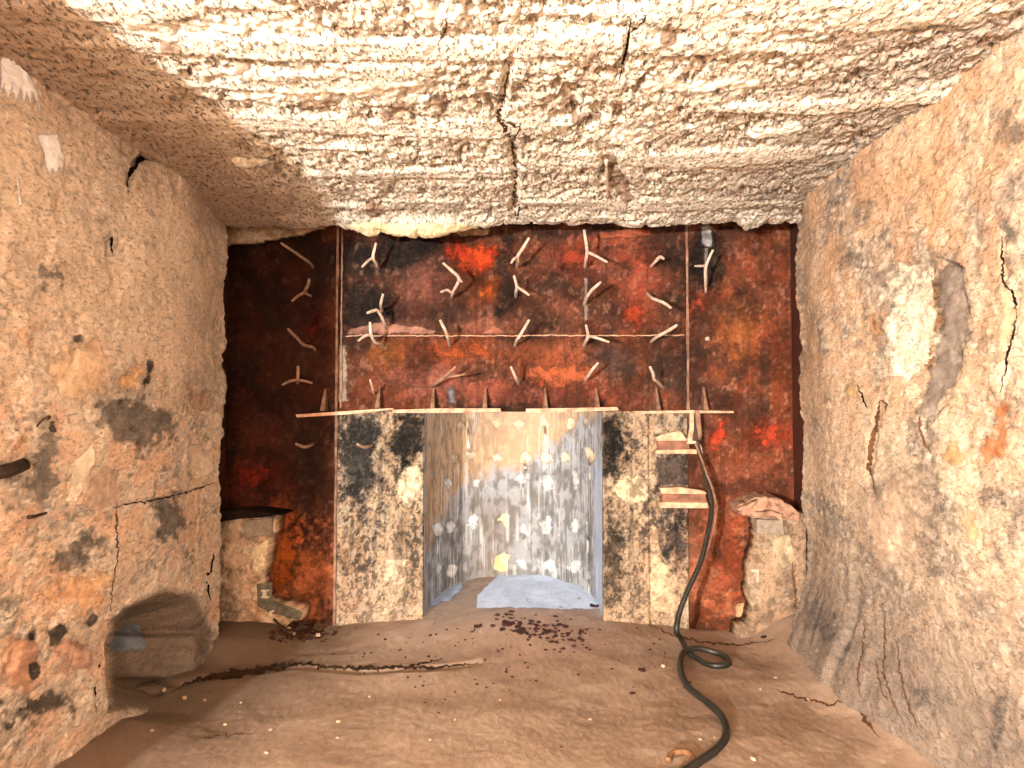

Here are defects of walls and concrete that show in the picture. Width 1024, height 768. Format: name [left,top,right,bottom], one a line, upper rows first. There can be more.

crack [496,62,523,224]
rust [439,238,498,302]
spalling [870,250,938,387]
crack [999,236,1018,393]
rust [522,359,591,390]
mould [337,413,423,504]
water stain [589,414,632,482]
water stain [654,454,688,487]
crack [857,384,888,495]
water stain [660,512,688,563]
rust [697,587,742,623]
crack [139,658,479,695]